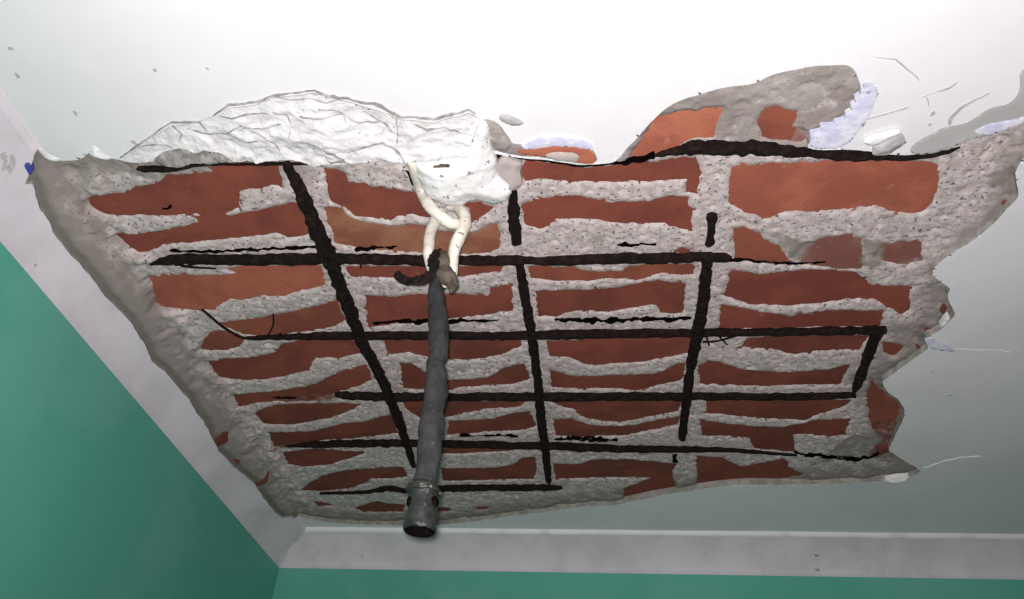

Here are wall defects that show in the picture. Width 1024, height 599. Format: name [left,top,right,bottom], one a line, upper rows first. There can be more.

crack [868,56,990,126]
rust [436,250,459,294]
flaking render [24,65,1024,521]